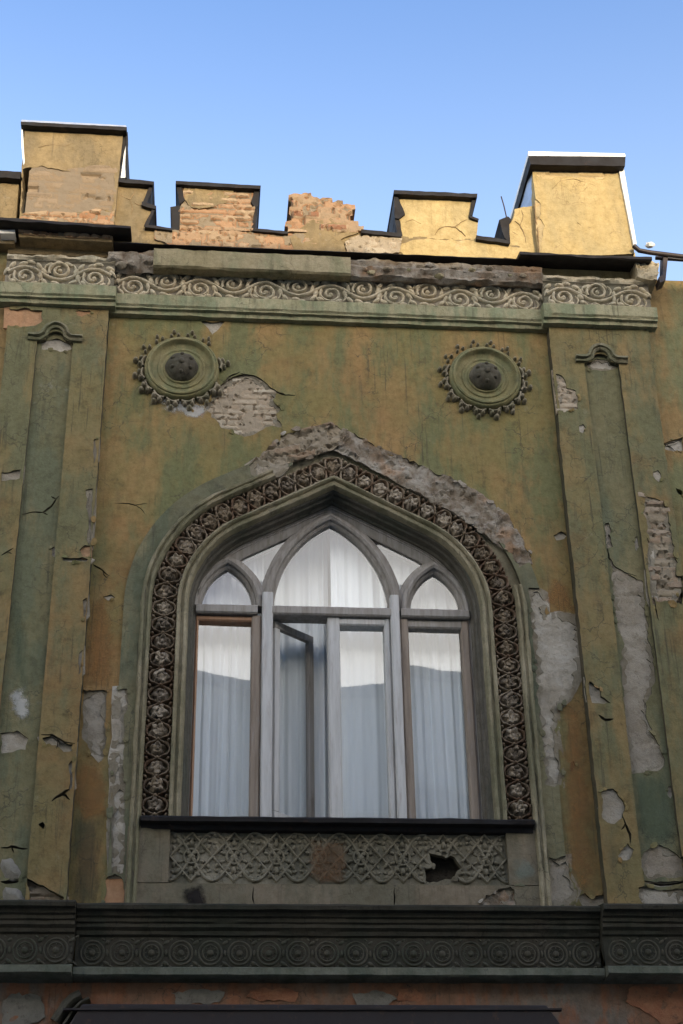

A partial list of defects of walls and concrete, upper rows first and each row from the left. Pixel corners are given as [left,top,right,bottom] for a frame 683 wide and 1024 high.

spalling [18,165,118,239]
flaking render [192,375,348,479]
flaking render [551,370,581,416]
peeling [604,491,683,775]
peeling [528,588,608,788]
peeling [0,647,131,903]
spalling [597,787,629,824]
spalling [424,852,458,883]
spalling [618,842,683,904]